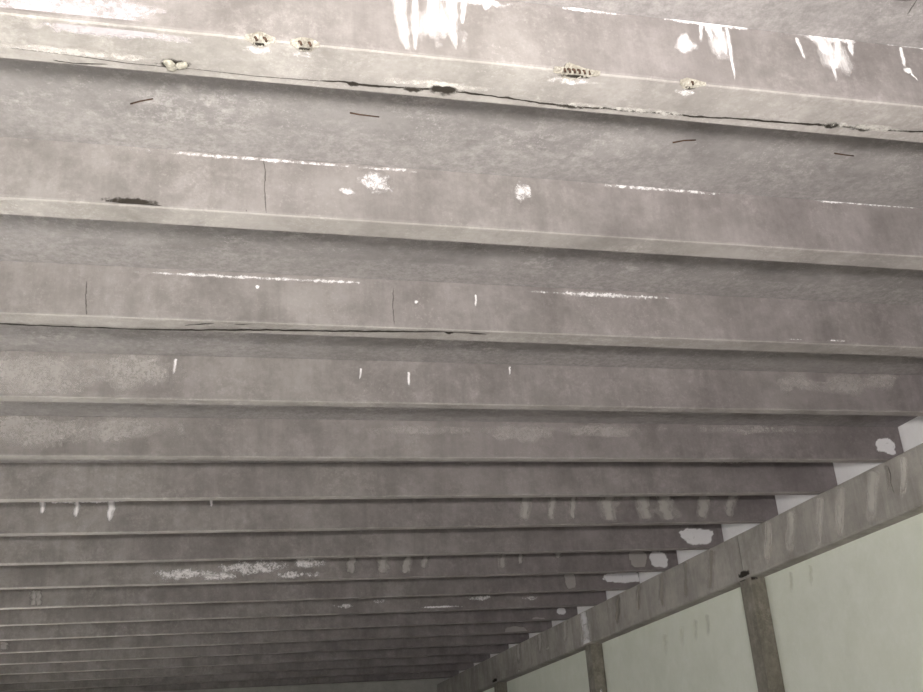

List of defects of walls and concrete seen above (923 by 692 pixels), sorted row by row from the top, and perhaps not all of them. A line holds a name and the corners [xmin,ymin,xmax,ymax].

water stain [396,0,500,46]
spalling [245,31,275,53]
spalling [290,37,320,54]
water stain [673,19,747,73]
water stain [795,35,854,75]
spalling [553,62,601,85]
crack [13,48,923,132]
water stain [163,273,298,289]
water stain [566,291,657,299]